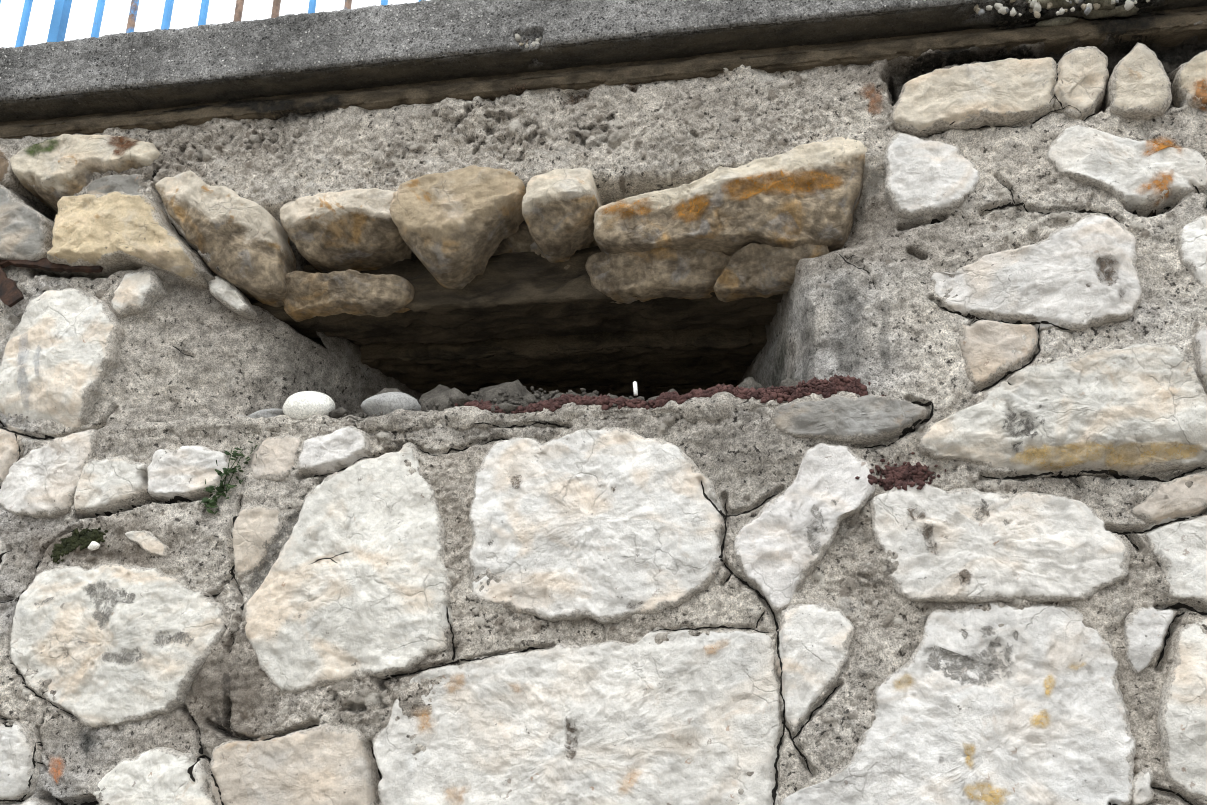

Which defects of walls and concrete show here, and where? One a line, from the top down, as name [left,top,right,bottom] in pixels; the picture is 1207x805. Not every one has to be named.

spalling [974,0,1150,27]
crack [0,489,194,603]
crack [204,499,244,653]
crack [10,657,78,719]
crack [656,480,840,805]
crack [0,718,99,805]